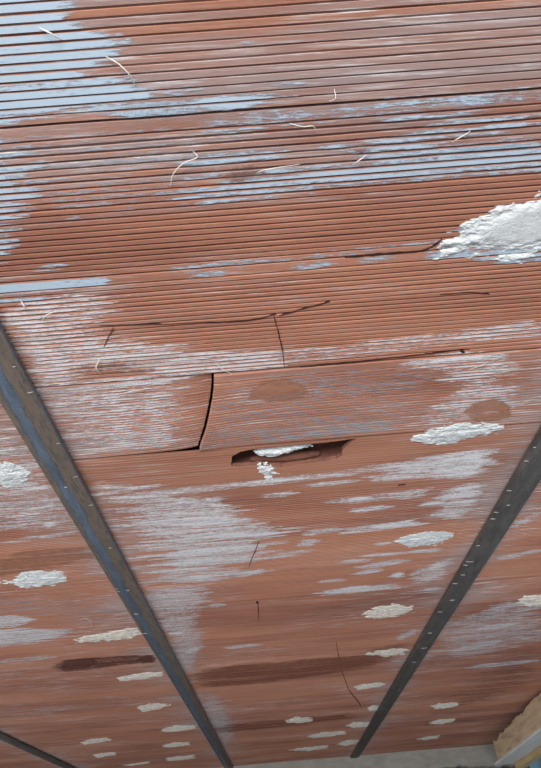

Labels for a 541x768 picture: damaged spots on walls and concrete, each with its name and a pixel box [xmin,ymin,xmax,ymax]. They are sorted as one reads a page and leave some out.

water stain [0,0,541,263]
water stain [174,241,541,277]
crack [345,238,442,258]
water stain [0,277,541,453]
crack [100,300,465,367]
water stain [0,425,79,543]
spalling [73,422,541,511]
water stain [91,449,503,686]
water stain [0,600,114,647]
water stain [428,599,541,705]